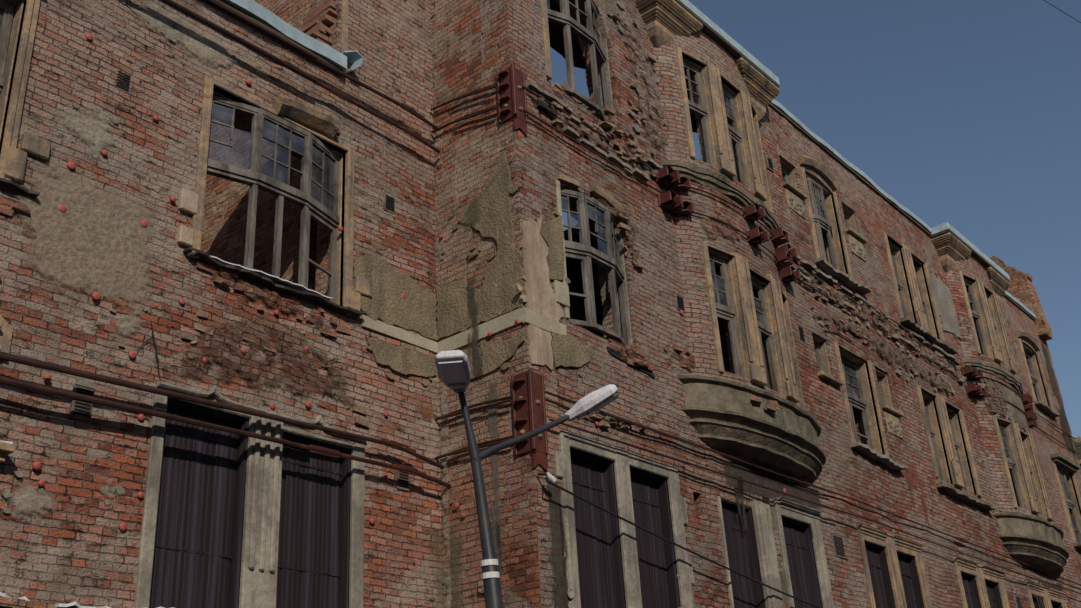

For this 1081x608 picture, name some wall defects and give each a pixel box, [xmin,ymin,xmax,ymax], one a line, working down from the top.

spalling [523,81,663,176]
flaking render [353,150,655,380]
spalling [663,346,696,370]